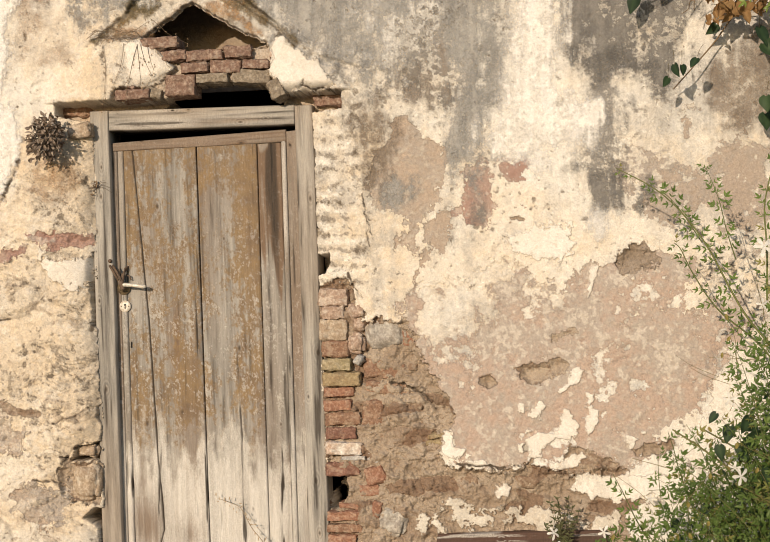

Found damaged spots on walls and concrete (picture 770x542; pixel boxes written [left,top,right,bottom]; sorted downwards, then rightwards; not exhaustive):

damp [0,0,20,94]
damp [0,103,22,201]
damp [66,0,154,29]
peeling [121,38,172,90]
damp [256,0,703,241]
flaking render [681,102,701,139]
damp [708,31,770,128]
flaking render [319,115,770,542]